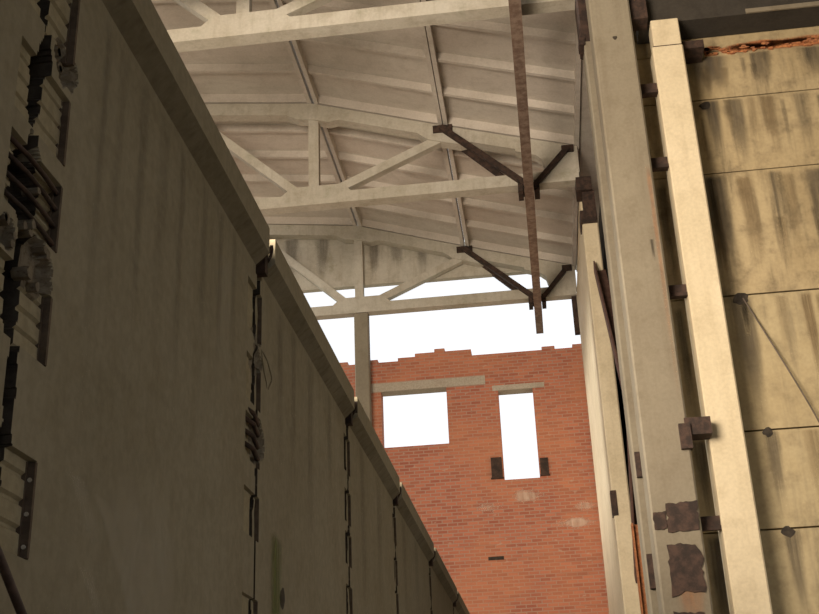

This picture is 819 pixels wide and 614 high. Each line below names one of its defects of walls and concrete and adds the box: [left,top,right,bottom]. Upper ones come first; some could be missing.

spalling [54,36,79,93]
leakage [707,101,719,131]
rust [703,35,819,56]
crack [0,0,53,486]
spalling [0,135,59,301]
leakage [706,178,731,237]
crack [250,281,272,420]
crack [248,468,258,614]
crack [344,401,358,614]
leakage [710,539,727,611]